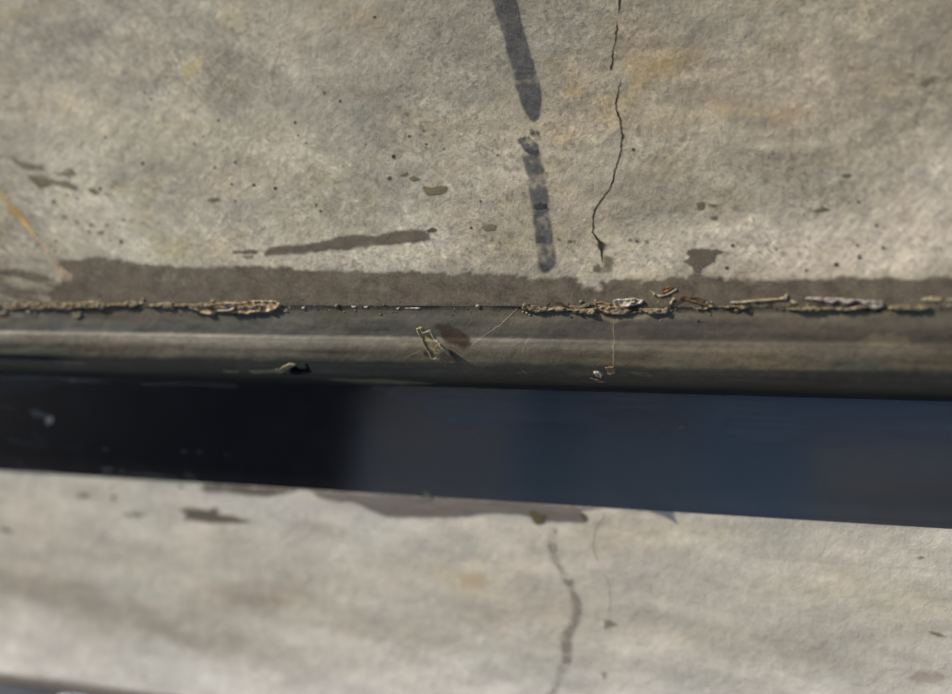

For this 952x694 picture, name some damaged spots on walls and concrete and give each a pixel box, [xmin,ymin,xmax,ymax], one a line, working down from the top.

crack [592,0,624,260]
damp [0,257,952,308]
spalling [0,300,289,319]
peeling [522,286,952,323]
spalling [416,326,469,364]